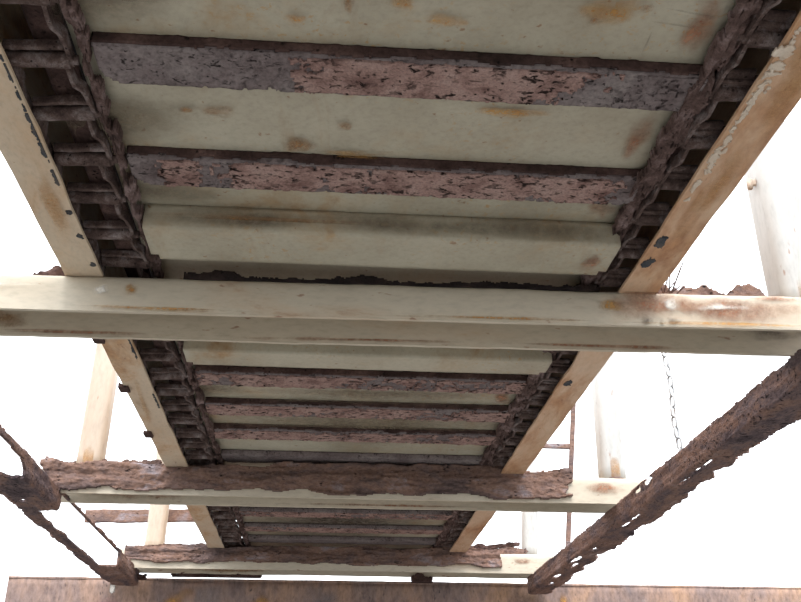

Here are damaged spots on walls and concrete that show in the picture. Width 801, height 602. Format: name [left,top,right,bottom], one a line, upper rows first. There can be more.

peeling [0,54,60,186]
peeling [683,26,801,202]
corrosion [44,330,116,344]
peeling [40,456,573,500]
peeling [124,543,502,568]